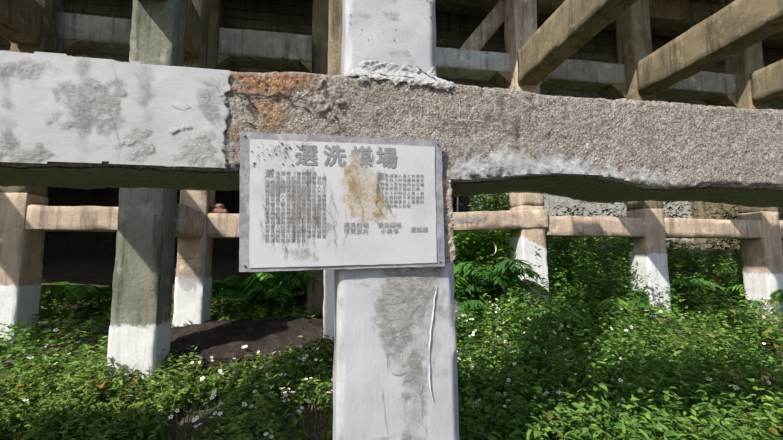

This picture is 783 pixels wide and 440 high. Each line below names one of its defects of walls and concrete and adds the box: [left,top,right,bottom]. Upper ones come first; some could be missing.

peeling [0,51,232,168]
rust [230,71,322,132]
spalling [305,75,347,123]
peeling [374,138,680,399]